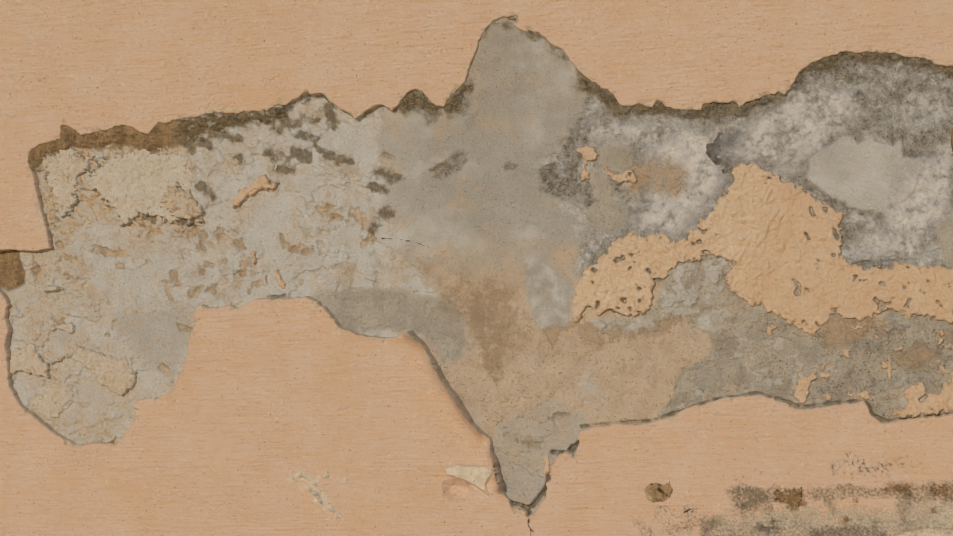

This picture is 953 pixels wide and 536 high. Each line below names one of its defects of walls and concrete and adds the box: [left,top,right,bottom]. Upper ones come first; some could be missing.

spalling [375,16,953,329]
damp [558,83,865,238]
damp [859,148,953,264]
damp [901,74,953,135]
spalling [0,92,953,519]
damp [732,486,944,509]